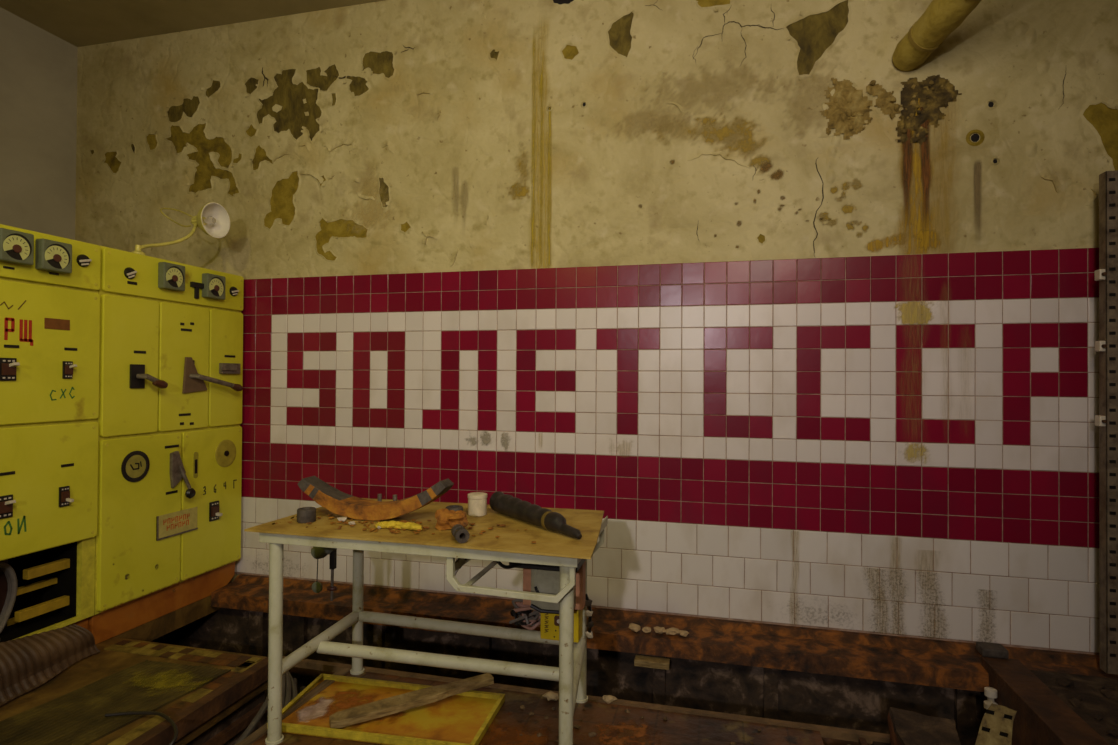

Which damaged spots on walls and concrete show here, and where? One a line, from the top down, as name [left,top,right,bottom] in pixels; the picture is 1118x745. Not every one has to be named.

peeling [606,9,636,59]
crack [693,5,782,66]
spalling [782,0,854,80]
peeling [90,49,397,198]
spalling [1079,98,1118,171]
peeling [262,170,335,230]
peeling [314,217,369,262]
peeling [377,175,392,210]
crack [813,158,824,256]
rust [900,98,936,254]